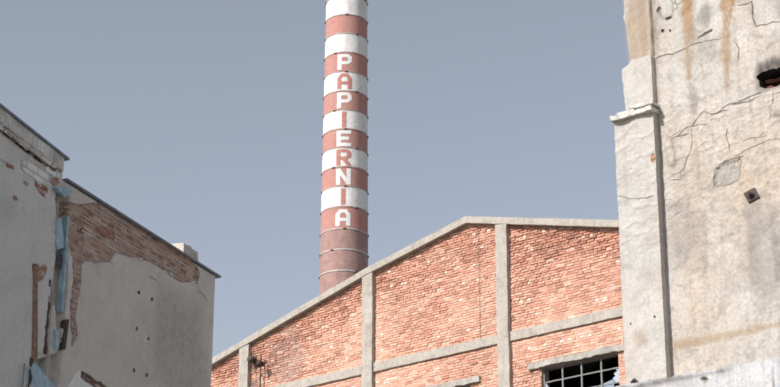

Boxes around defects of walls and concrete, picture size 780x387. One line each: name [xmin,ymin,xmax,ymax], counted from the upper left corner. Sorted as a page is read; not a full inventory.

corrosion [683,0,692,36]
crack [654,29,739,59]
corrosion [722,0,734,71]
crack [728,1,779,27]
spalling [756,67,780,88]
crack [669,91,780,186]
flaking render [0,123,61,199]
flaking render [714,156,741,186]
flaking render [58,202,200,346]
flaking render [68,371,100,387]